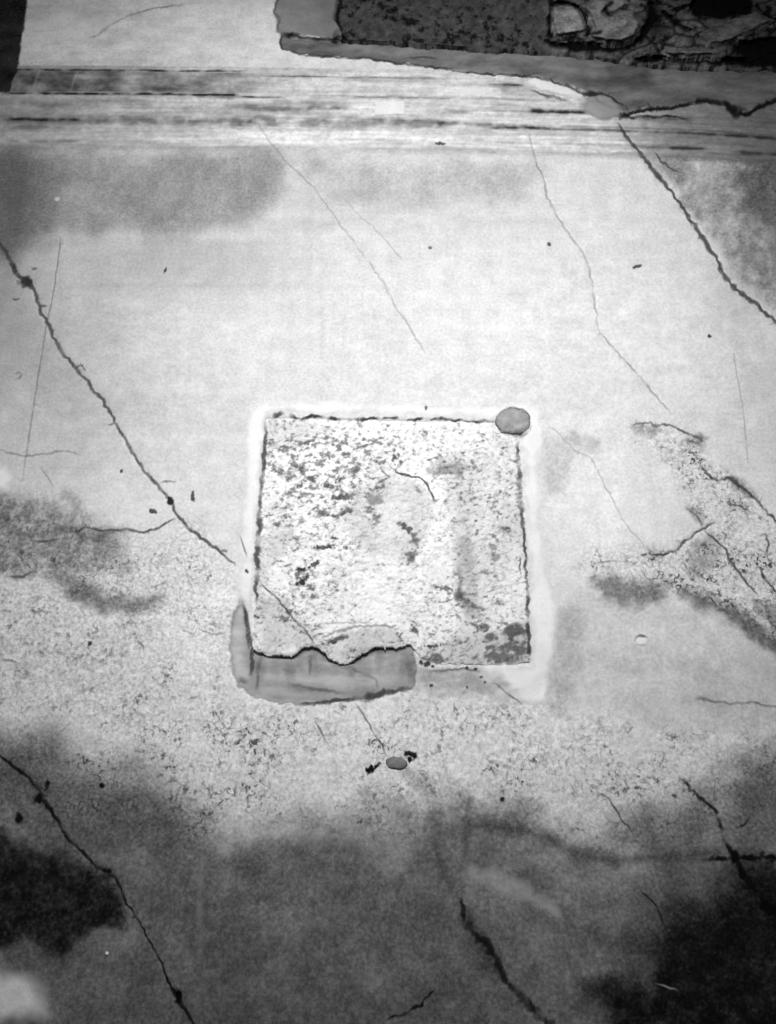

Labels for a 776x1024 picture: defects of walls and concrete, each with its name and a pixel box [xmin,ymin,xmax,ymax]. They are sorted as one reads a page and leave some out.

flaking render [273,0,776,113]
crack [510,74,776,323]
crack [0,242,232,562]
spalling [643,422,743,511]
spalling [649,543,776,626]
spalling [229,601,530,707]
spalling [65,756,137,814]
crack [0,754,194,1024]
crack [684,781,776,915]
crack [460,899,553,1024]